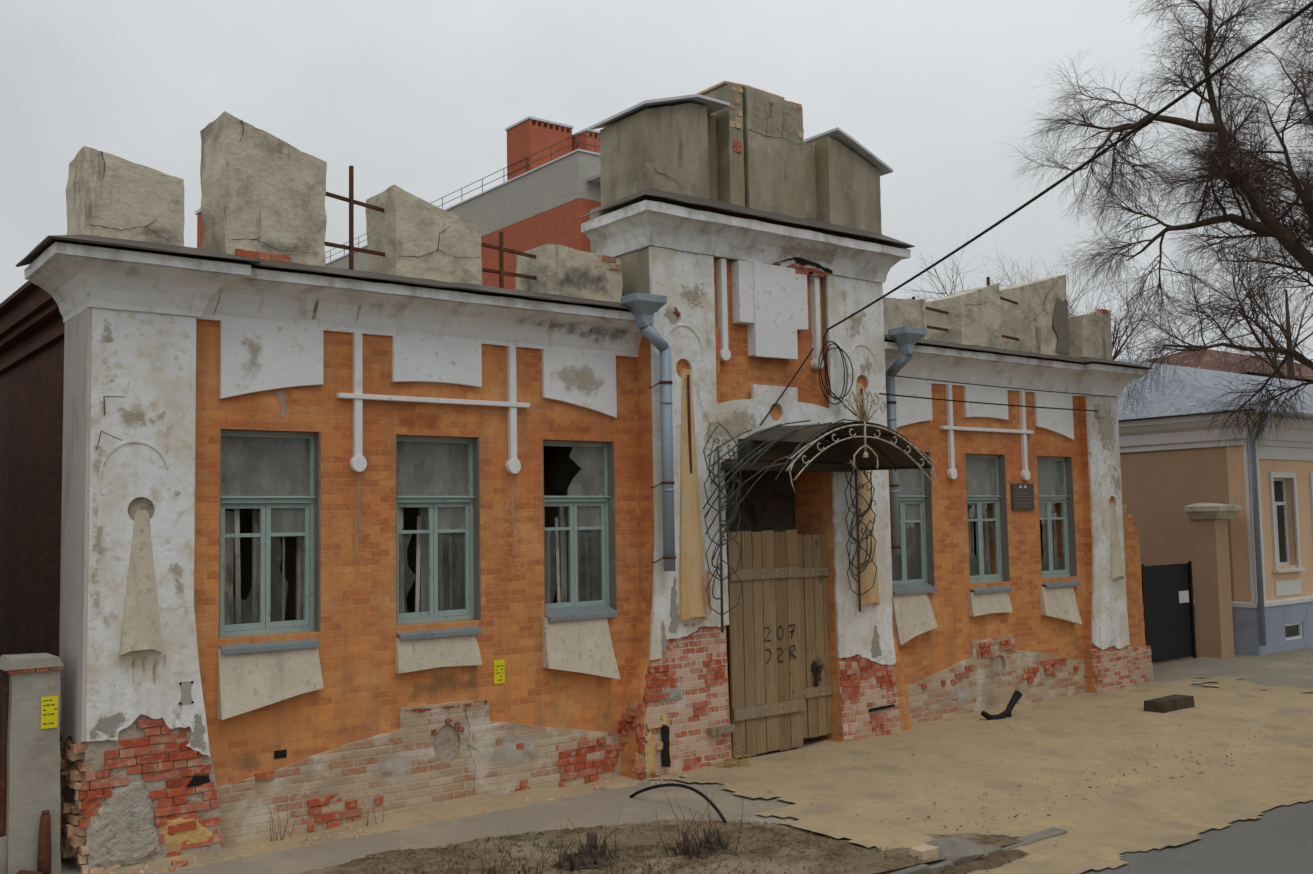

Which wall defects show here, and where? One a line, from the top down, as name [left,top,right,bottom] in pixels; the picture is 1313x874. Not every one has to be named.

crack [401,225,480,258]
spalling [773,246,837,277]
spalling [555,578,731,787]
spalling [839,626,901,741]
spalling [917,639,1015,688]
spalling [1017,645,1135,693]
spalling [405,700,487,735]
spalling [60,713,223,874]
spalling [300,794,384,833]